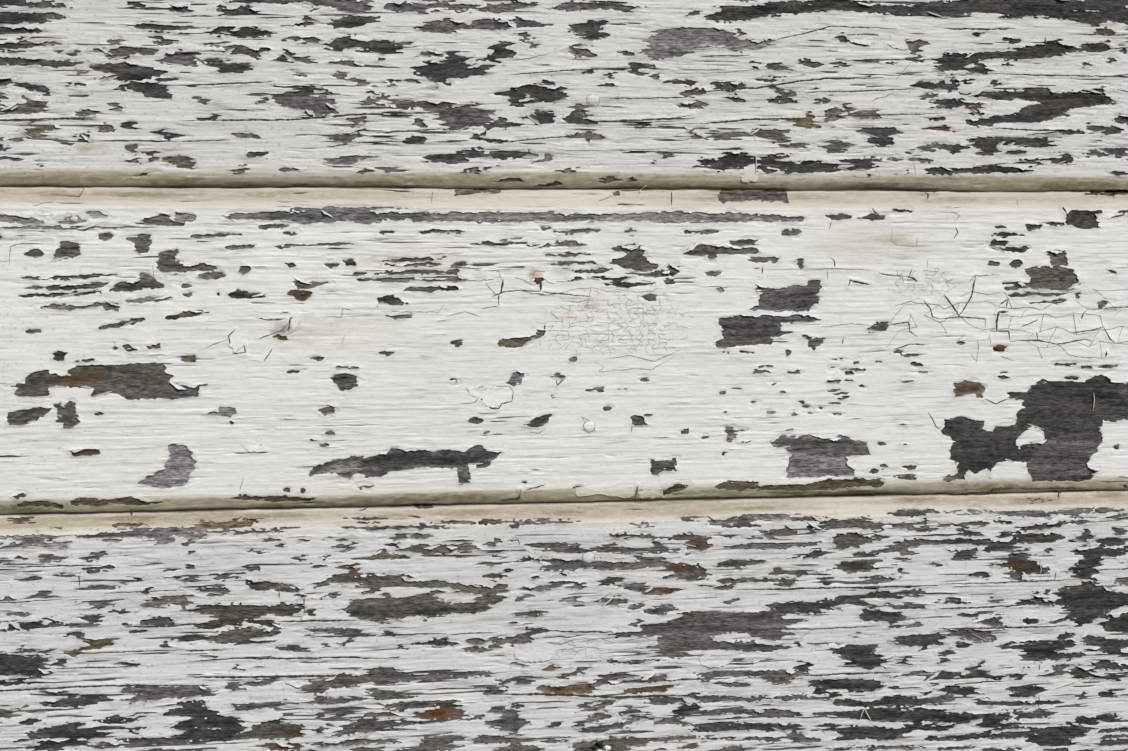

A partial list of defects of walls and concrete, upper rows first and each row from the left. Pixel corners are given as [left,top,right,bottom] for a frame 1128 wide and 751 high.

peeling [0,0,1128,341]
peeling [6,343,208,429]
peeling [204,407,236,424]
peeling [330,365,359,391]
peeling [231,370,526,503]
peeling [497,329,546,348]
peeling [524,414,552,427]
peeling [630,414,653,426]
peeling [715,258,826,393]
peeling [714,349,927,492]
crack [815,208,1128,362]
peeling [941,363,1128,487]